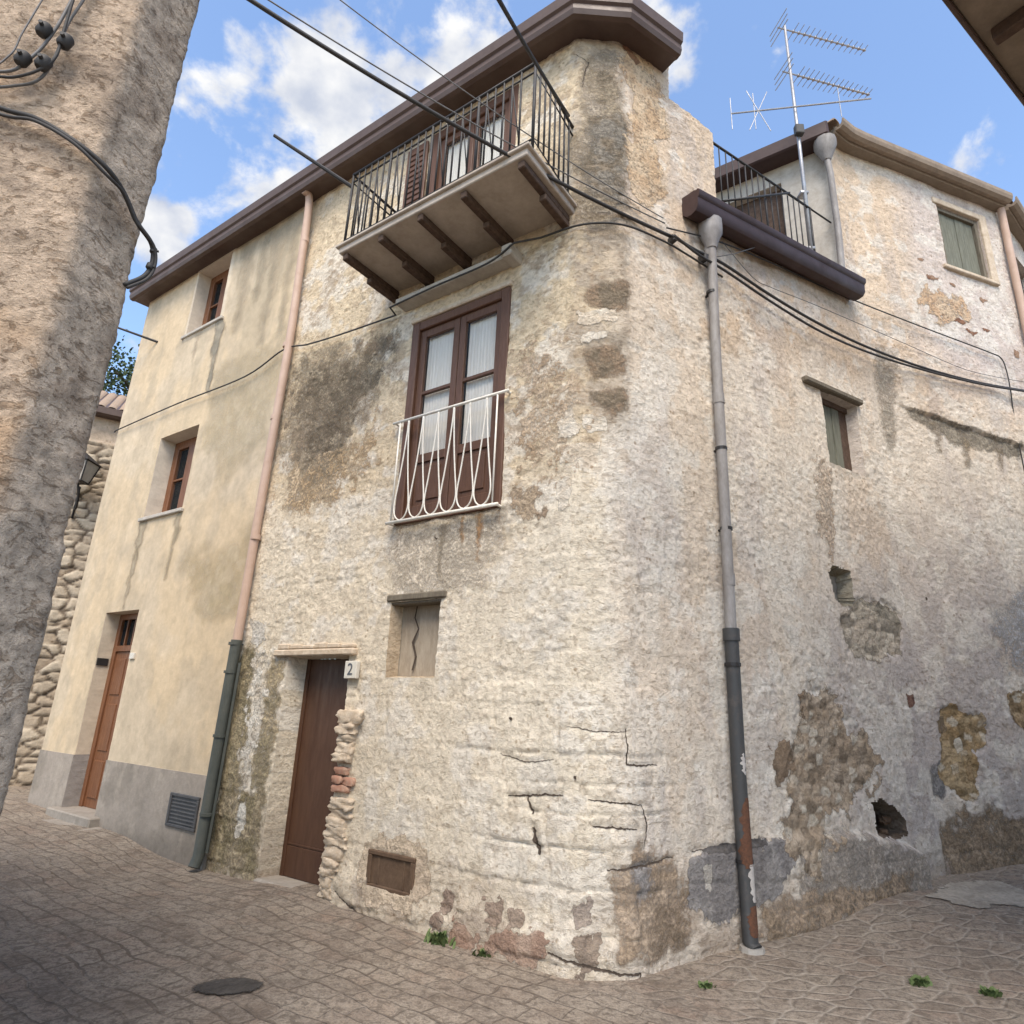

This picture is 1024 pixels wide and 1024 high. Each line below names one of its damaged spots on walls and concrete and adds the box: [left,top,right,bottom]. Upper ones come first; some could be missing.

peeling [917,274,990,336]
damp [273,330,401,515]
flaking render [840,598,902,663]
peeling [356,832,553,969]
crack [508,793,563,855]
peeling [571,896,603,980]
crack [565,725,657,767]
crack [588,799,717,871]
peeling [687,843,740,926]
corrosion [738,798,758,938]
flaking render [751,680,885,908]
flaking render [937,703,987,802]